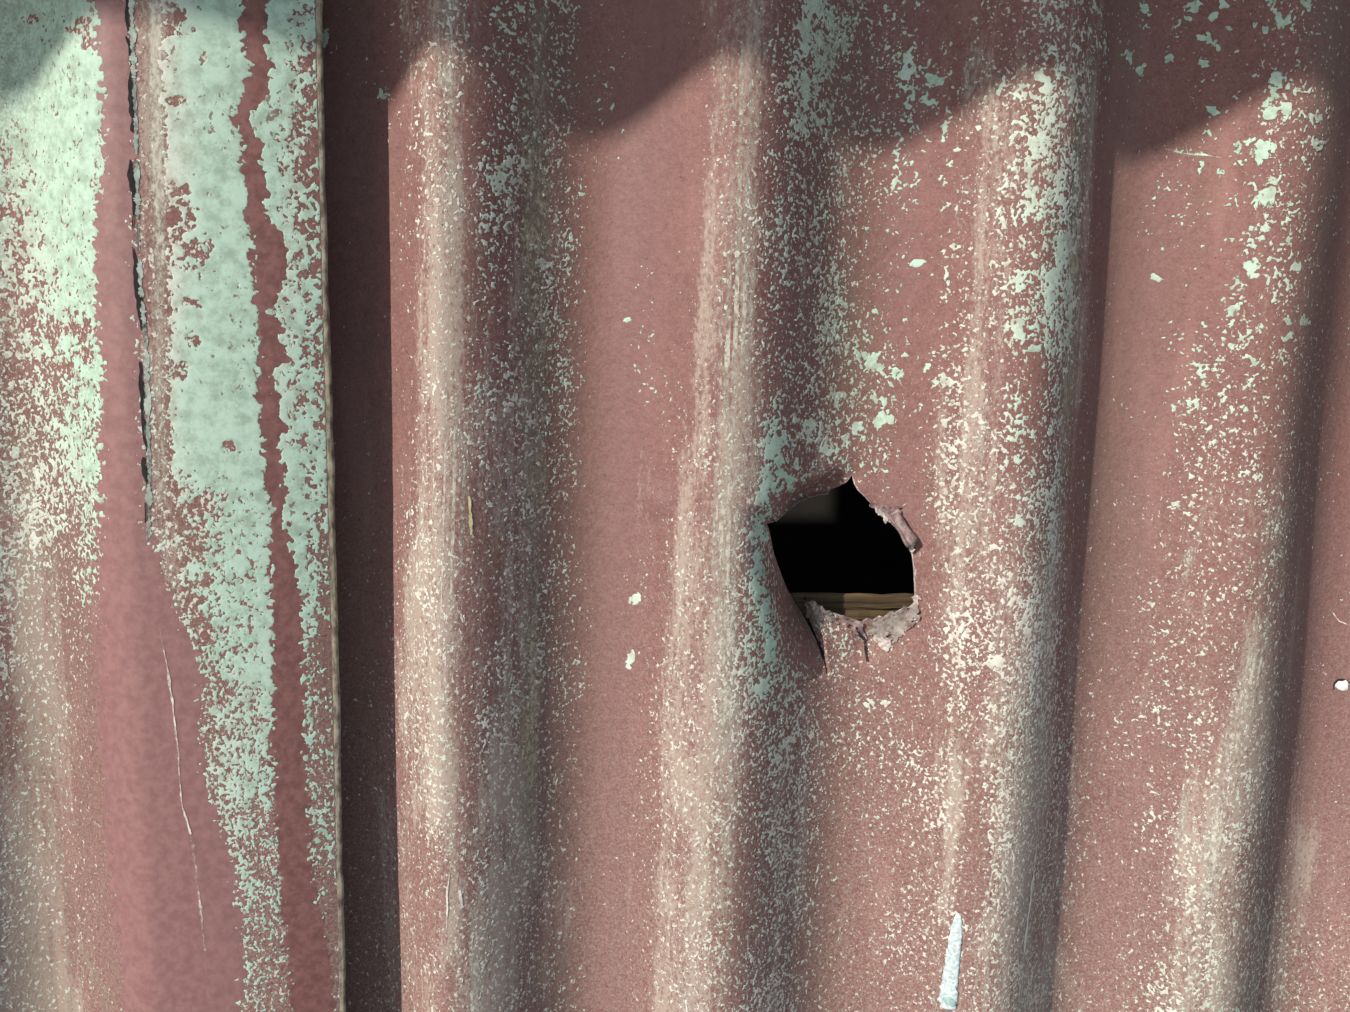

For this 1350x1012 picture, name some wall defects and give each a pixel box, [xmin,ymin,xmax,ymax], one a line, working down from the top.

crack [125,0,153,539]
peeling [0,0,337,1012]
peeling [374,0,651,1011]
peeling [617,0,1338,1012]